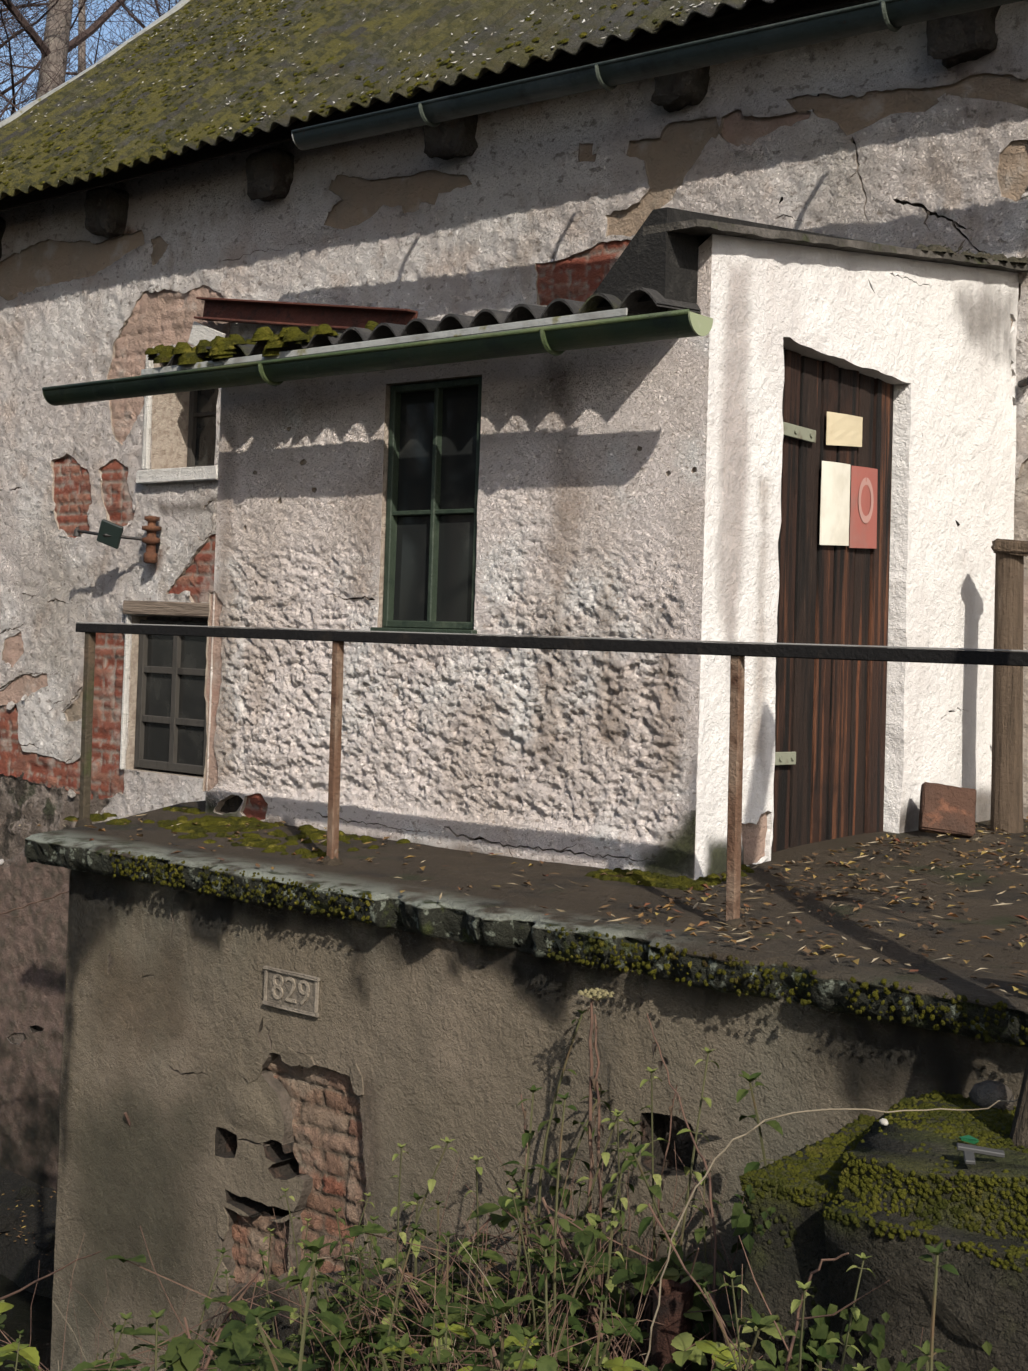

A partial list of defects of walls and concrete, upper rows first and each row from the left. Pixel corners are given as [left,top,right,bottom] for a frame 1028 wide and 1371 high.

peeling [536,69,1028,306]
crack [853,140,981,252]
spalling [108,284,230,379]
spalling [51,396,144,538]
peeling [168,534,223,791]
spalling [1013,461,1028,819]
spalling [0,632,125,865]
spalling [220,793,268,820]
water stain [189,896,331,946]
water stain [536,976,566,1020]
water stain [827,1023,980,1100]
spalling [217,1047,370,1292]